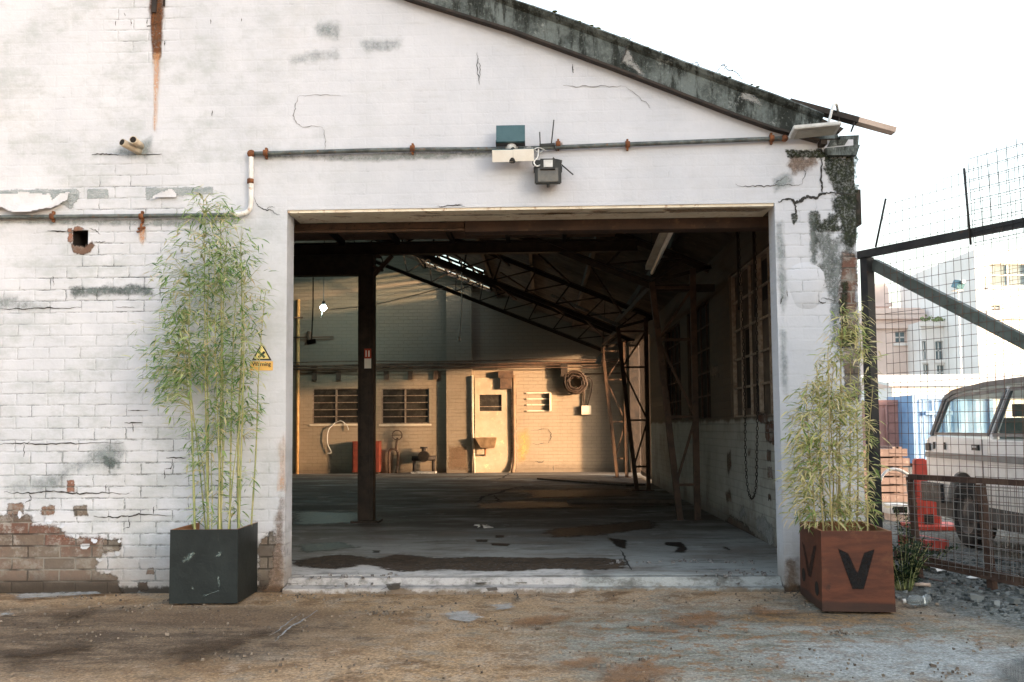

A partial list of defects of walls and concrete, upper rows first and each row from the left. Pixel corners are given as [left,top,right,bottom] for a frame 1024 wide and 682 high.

corrosion [149,0,164,100]
crack [563,37,648,104]
crack [293,94,339,156]
peeling [0,189,108,212]
peeling [145,187,213,200]
crack [736,158,857,214]
leakage [776,149,825,187]
spalling [67,226,95,255]
spalling [0,502,124,594]